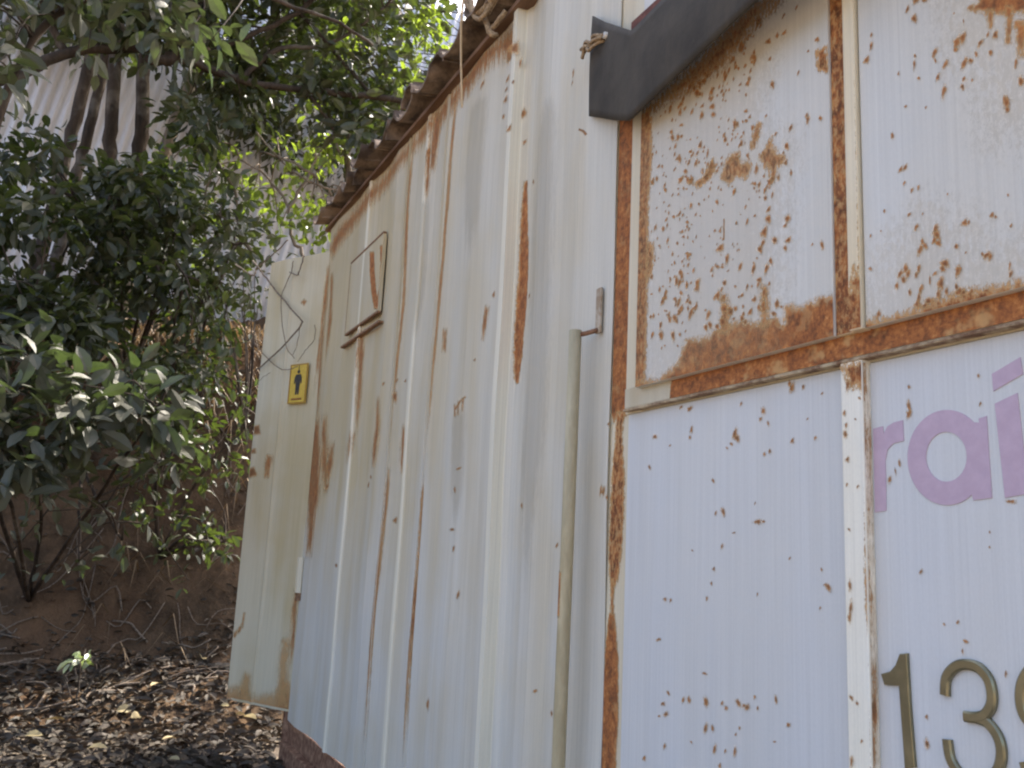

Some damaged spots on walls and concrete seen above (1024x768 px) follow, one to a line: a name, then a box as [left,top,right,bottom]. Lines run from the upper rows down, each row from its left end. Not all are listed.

rust [306,29,522,553]
rust [513,180,534,384]
rust [599,0,1024,768]
rust [227,643,290,709]
rust [366,476,397,706]
rust [404,490,423,728]